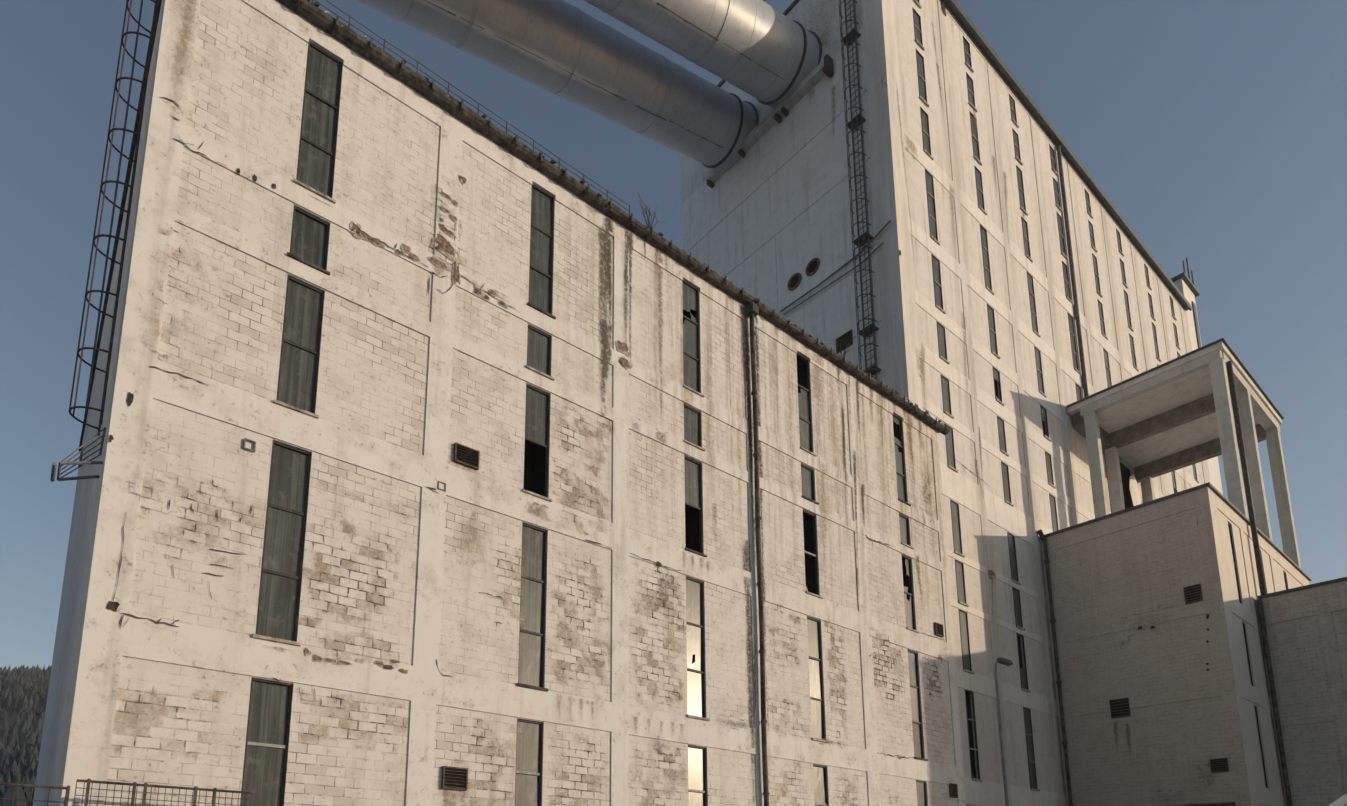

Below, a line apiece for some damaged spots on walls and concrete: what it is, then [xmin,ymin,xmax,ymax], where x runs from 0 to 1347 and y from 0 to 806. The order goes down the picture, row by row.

spalling [349,188,508,308]
water stain [599,217,667,402]
peeling [554,414,613,535]
peeling [303,534,408,673]
peeling [633,561,685,699]
peeling [869,634,904,700]